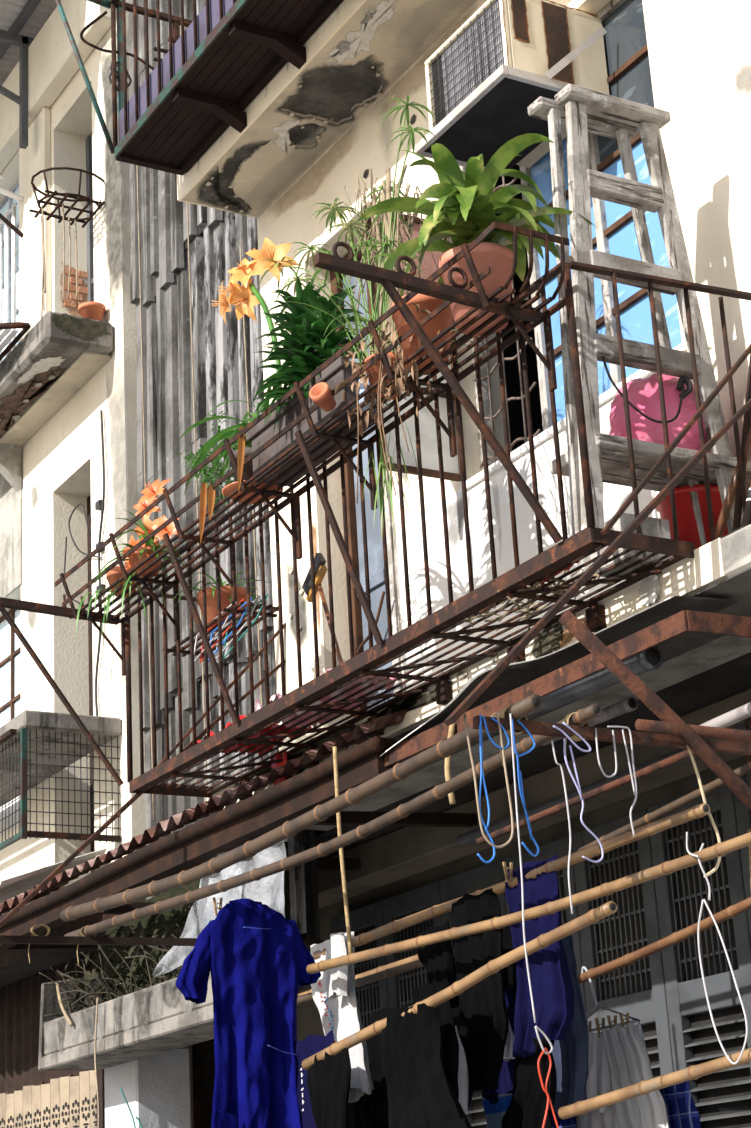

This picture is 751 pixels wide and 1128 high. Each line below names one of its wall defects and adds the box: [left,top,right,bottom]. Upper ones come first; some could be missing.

flaking render [198,0,397,214]
leakage [736,64,751,92]
spalling [0,367,66,437]